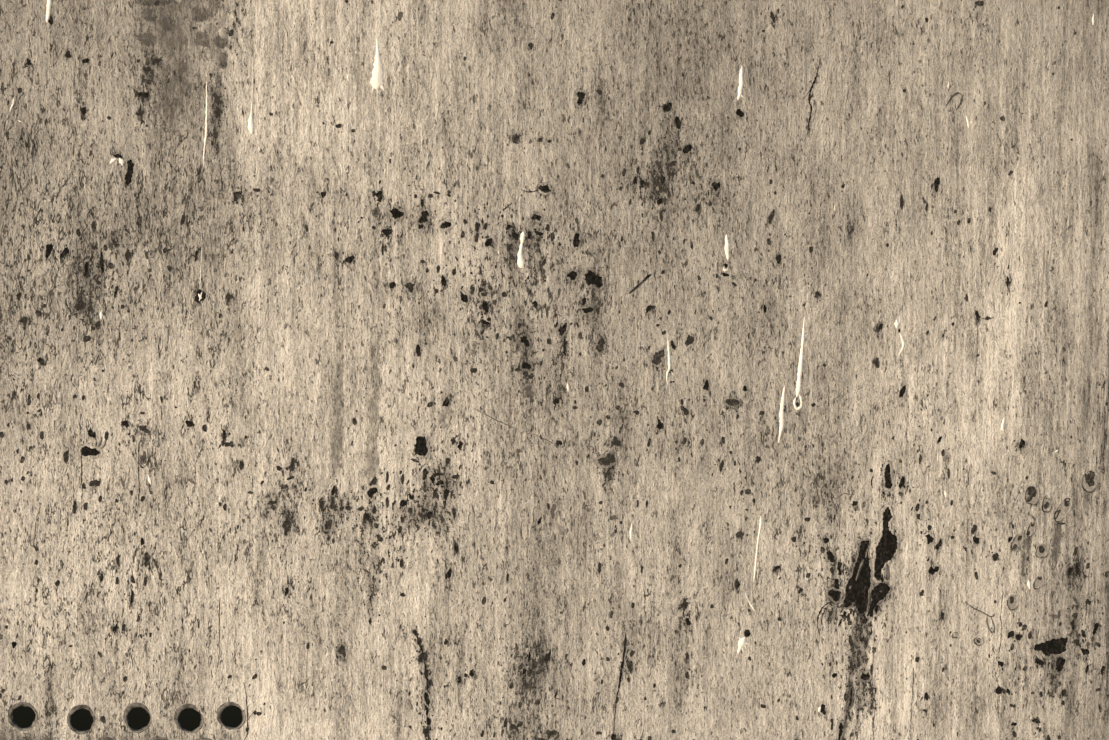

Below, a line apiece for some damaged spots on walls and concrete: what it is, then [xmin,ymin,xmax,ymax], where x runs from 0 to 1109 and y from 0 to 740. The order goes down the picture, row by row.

crack [803,52,822,134]
water stain [821,606,888,740]